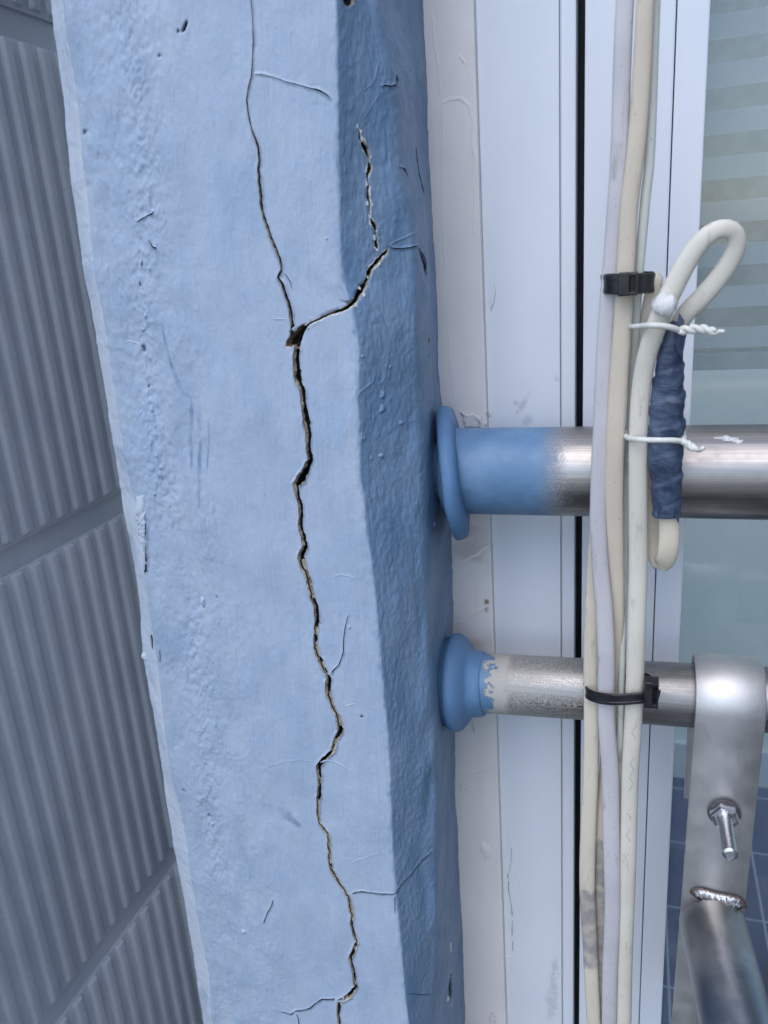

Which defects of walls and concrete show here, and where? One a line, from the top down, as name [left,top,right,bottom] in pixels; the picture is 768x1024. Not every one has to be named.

crack [216,0,433,1024]
crack [408,976,452,1001]